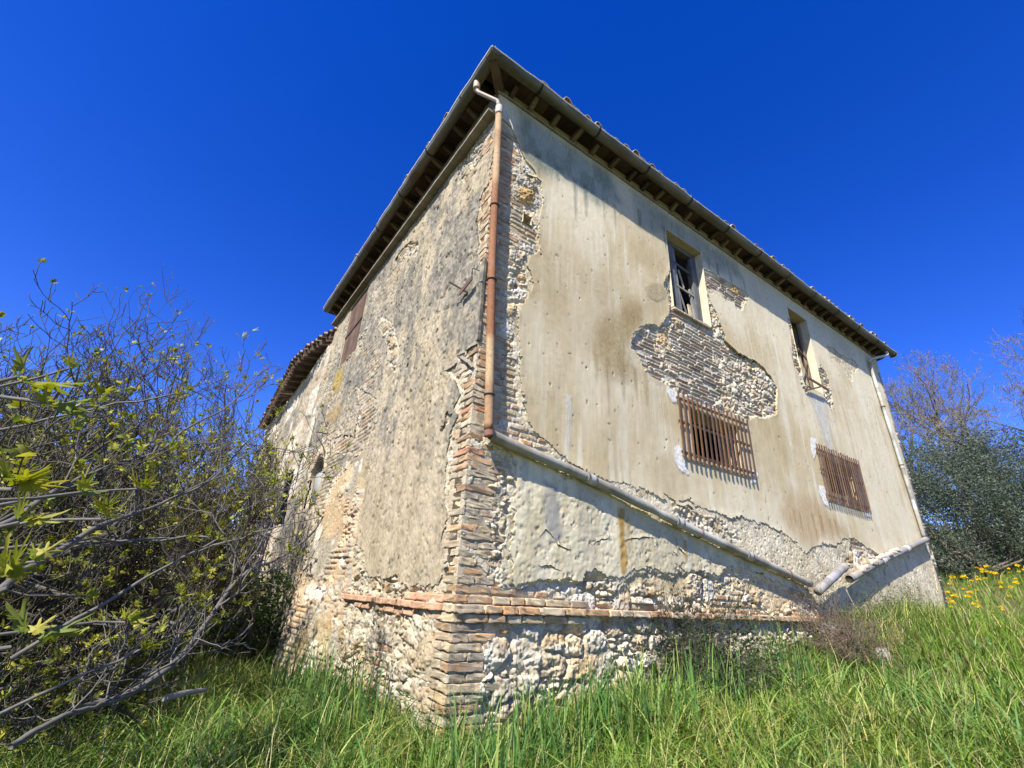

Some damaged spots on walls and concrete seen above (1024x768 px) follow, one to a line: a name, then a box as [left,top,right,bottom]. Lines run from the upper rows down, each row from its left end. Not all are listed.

spalling [451,120,947,742]